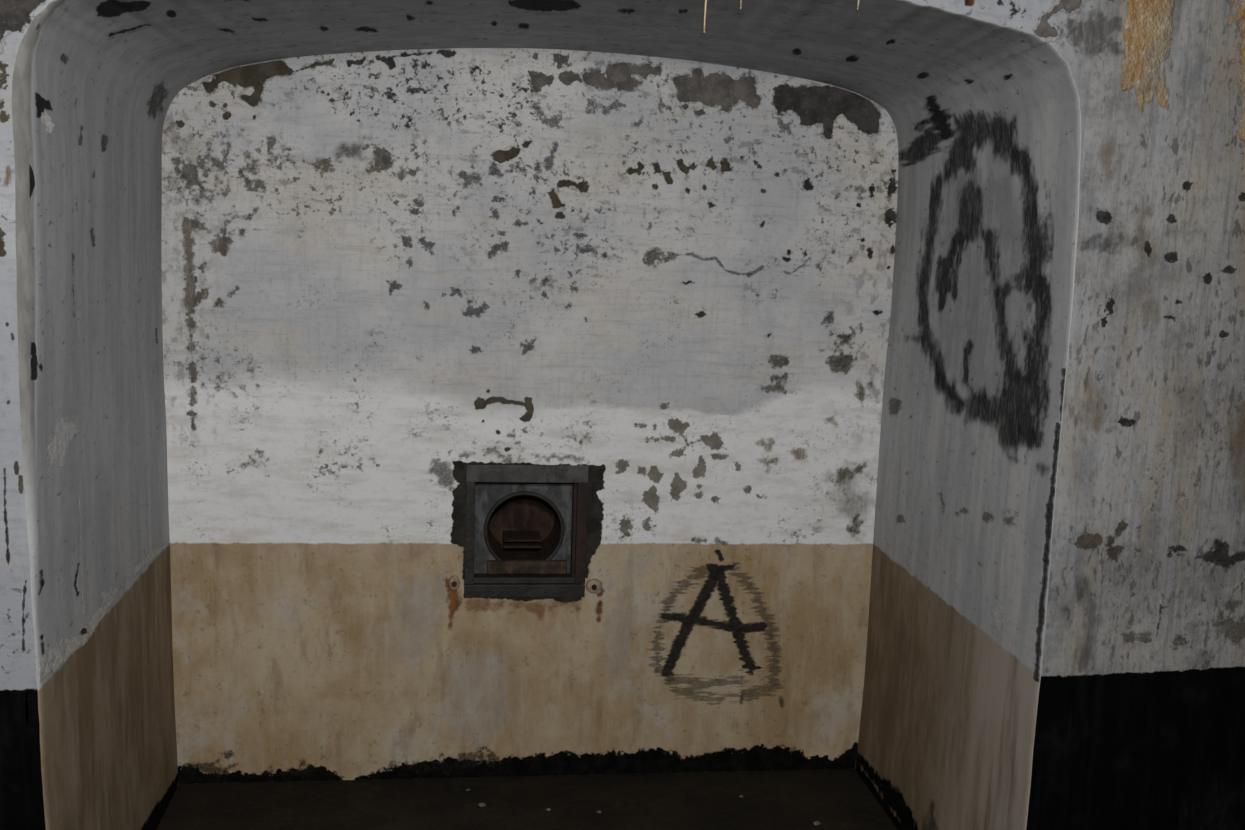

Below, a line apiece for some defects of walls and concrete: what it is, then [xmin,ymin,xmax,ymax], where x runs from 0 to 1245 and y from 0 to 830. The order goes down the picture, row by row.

peeling [96,0,151,37]
peeling [0,0,46,123]
peeling [35,93,55,134]
peeling [200,50,456,120]
peeling [528,53,885,140]
crack [667,252,810,277]
rust [446,579,579,627]
damp [389,751,500,775]